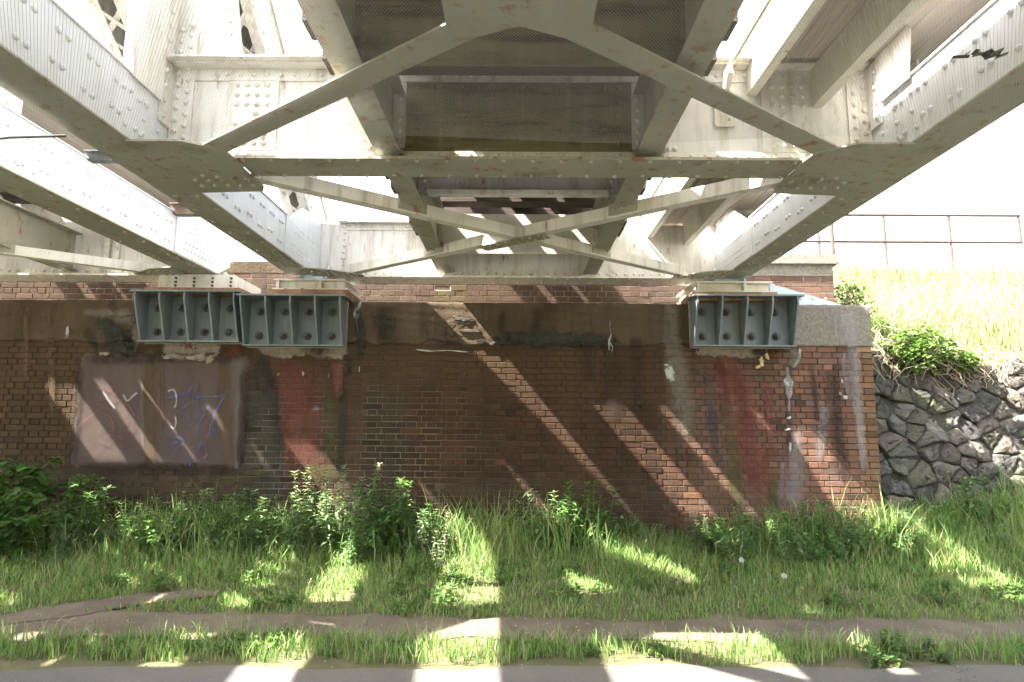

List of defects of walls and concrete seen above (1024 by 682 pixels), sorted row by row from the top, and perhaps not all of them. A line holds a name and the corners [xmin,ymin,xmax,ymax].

leakage [84,309,281,475]
peeling [162,343,242,364]
peeling [257,347,348,360]
spalling [440,316,496,345]
leakage [490,312,618,417]
peeling [696,347,778,369]
efflorescence [784,348,801,452]
leakage [828,377,849,477]